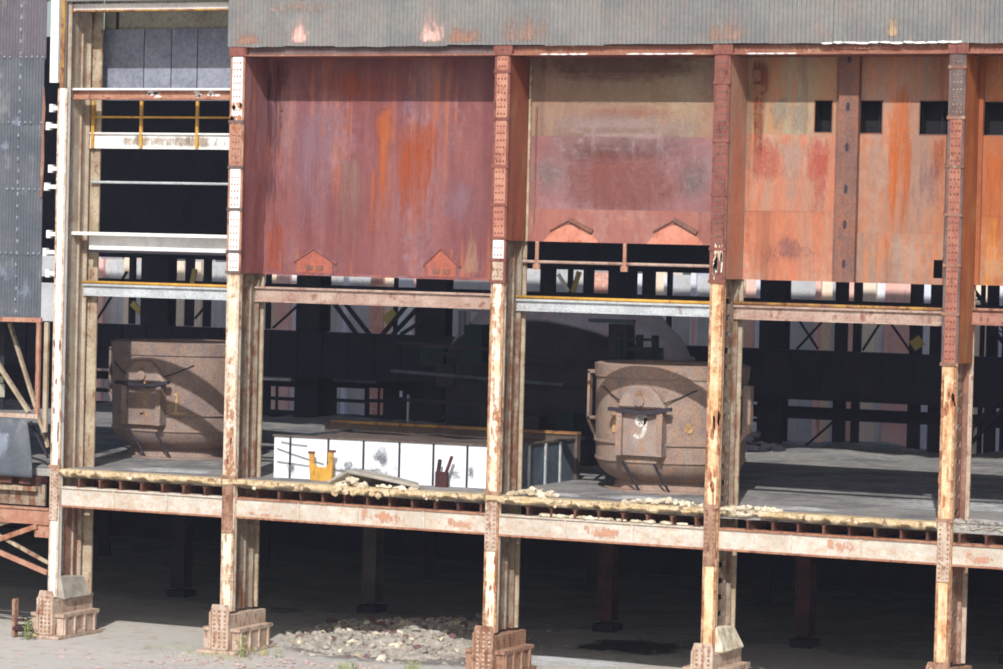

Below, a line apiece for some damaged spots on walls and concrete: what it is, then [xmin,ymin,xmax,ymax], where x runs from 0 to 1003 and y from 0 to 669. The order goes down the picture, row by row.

corrosion [752,63,768,144]